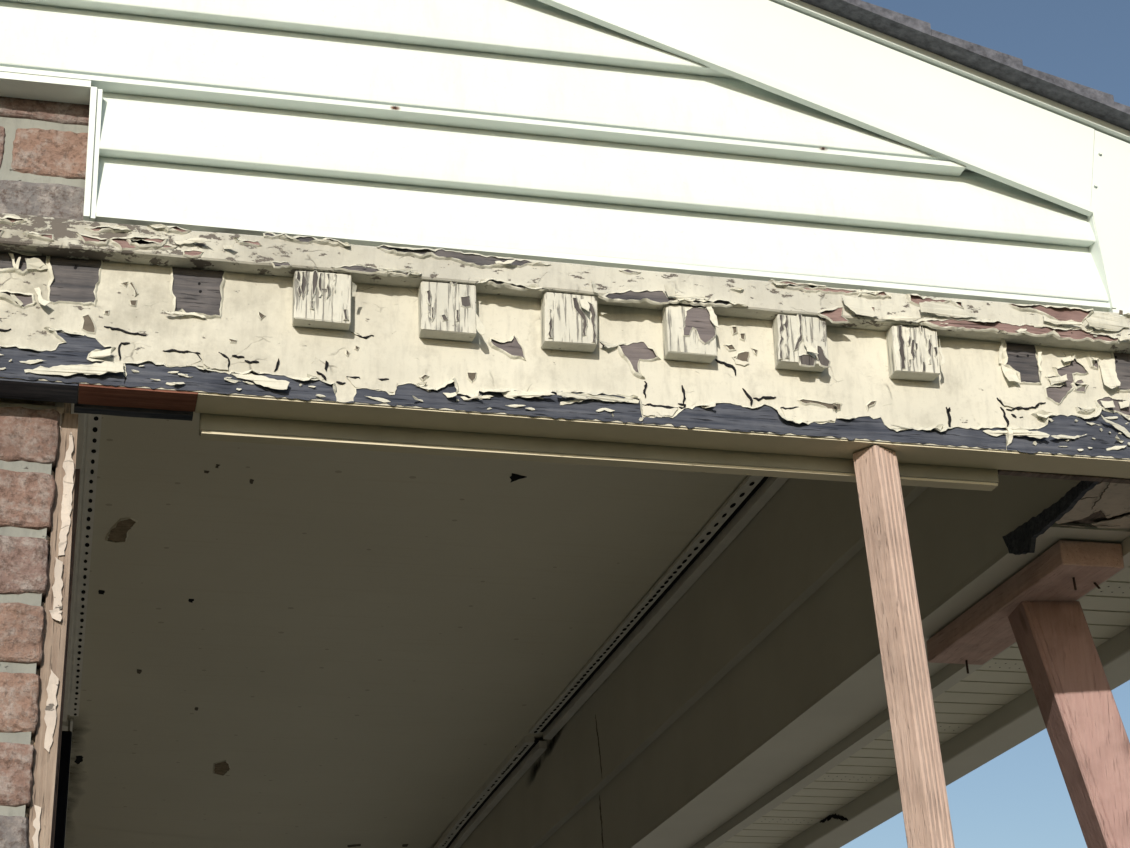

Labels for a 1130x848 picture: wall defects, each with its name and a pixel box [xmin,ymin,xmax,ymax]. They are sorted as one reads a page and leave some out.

peeling [0,250,48,276]
peeling [76,224,351,258]
peeling [0,287,51,309]
peeling [271,245,551,361]
peeling [571,280,758,379]
peeling [0,347,145,376]
peeling [224,373,326,397]
peeling [412,372,639,417]
peeling [768,279,1130,451]
peeling [49,402,74,622]
peeling [44,670,59,752]
peeling [32,805,41,848]